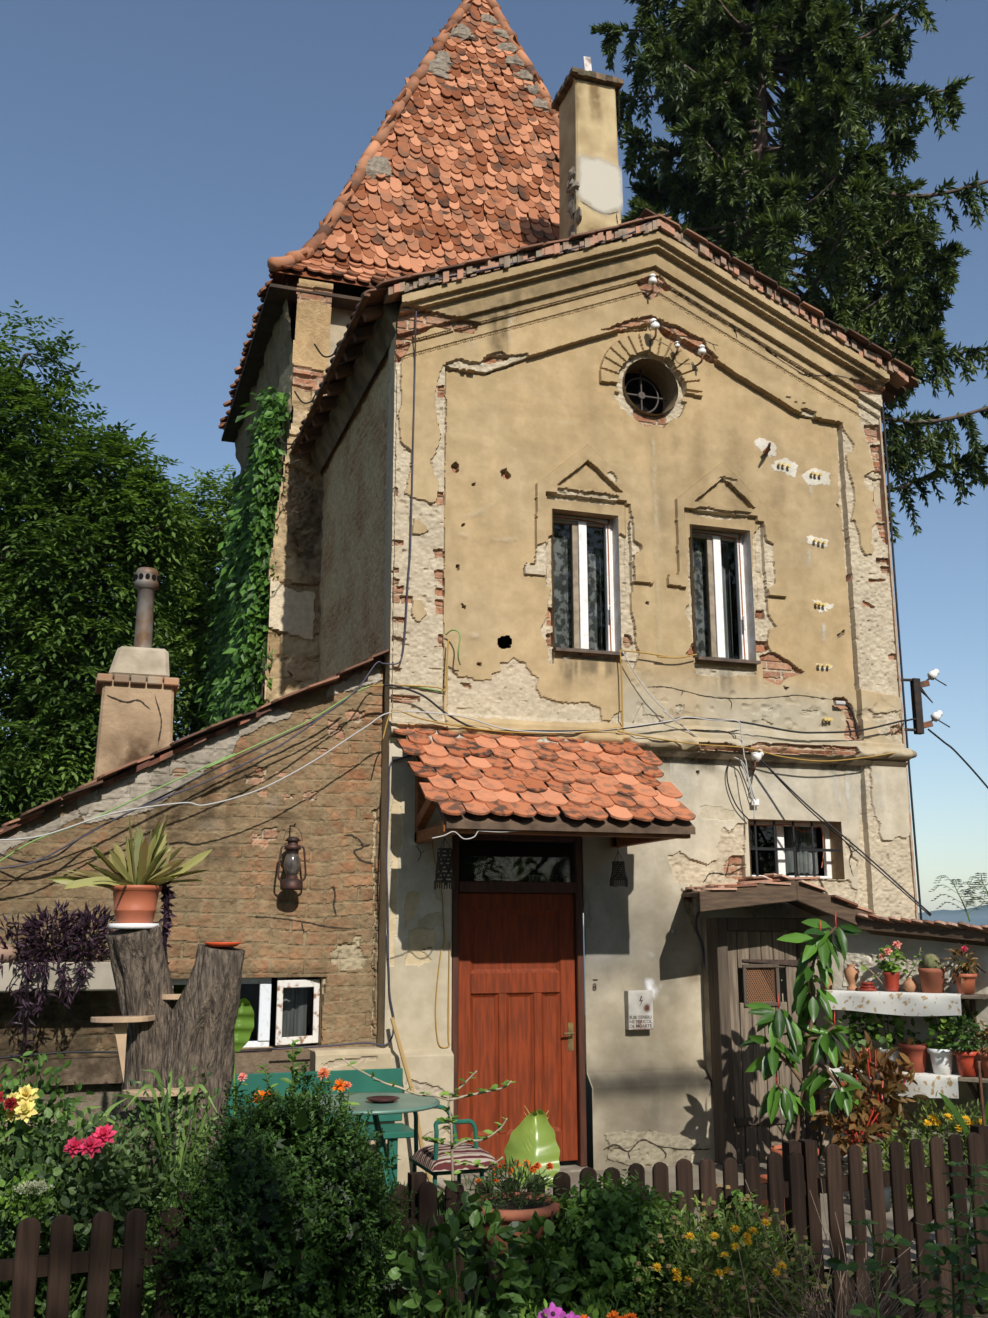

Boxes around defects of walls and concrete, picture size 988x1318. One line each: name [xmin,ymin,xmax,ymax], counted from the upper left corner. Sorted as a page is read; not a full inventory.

spalling [281,462,322,552]
spalling [322,301,622,1068]
spalling [523,511,643,669]
spalling [684,378,916,920]
spalling [668,823,746,931]